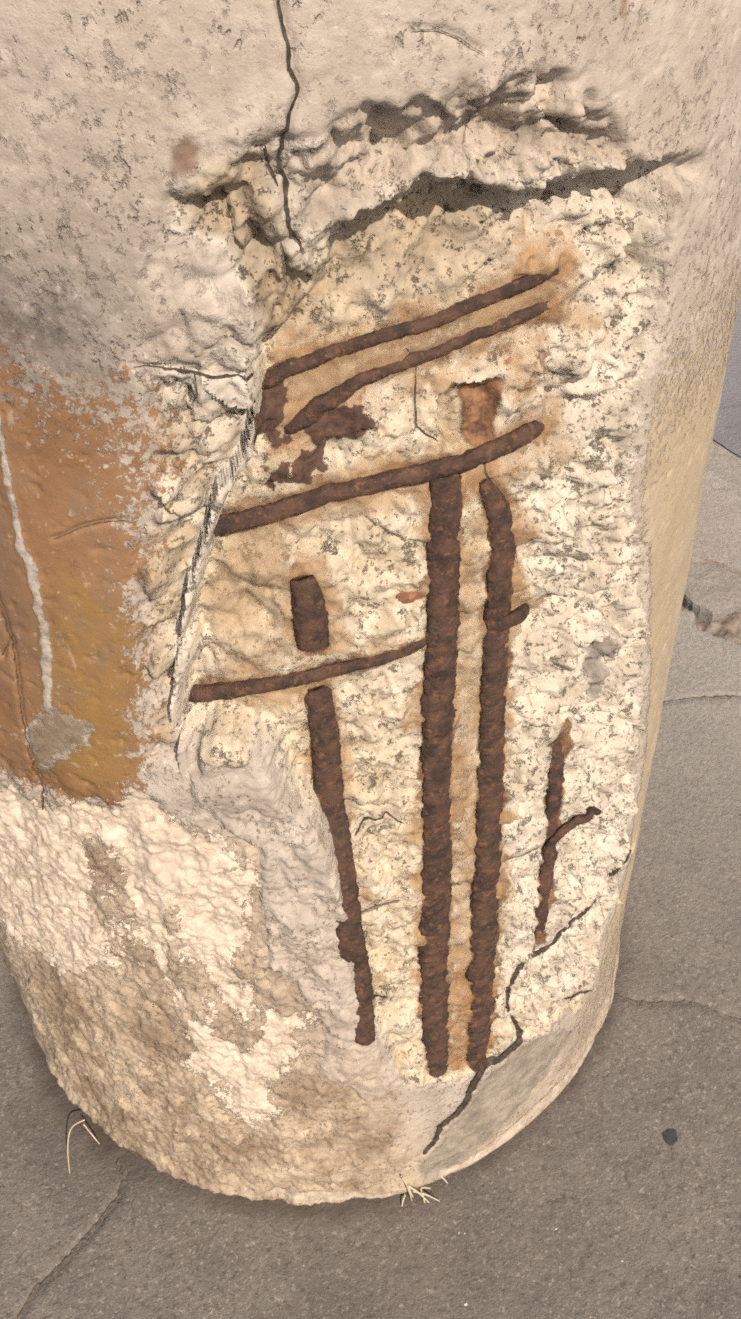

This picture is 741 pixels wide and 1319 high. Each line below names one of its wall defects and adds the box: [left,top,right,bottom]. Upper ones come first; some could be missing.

crack [264,0,302,280]
leakage [0,419,94,770]
spalling [0,54,687,1128]
rust [199,220,600,1067]
crack [423,850,632,1155]